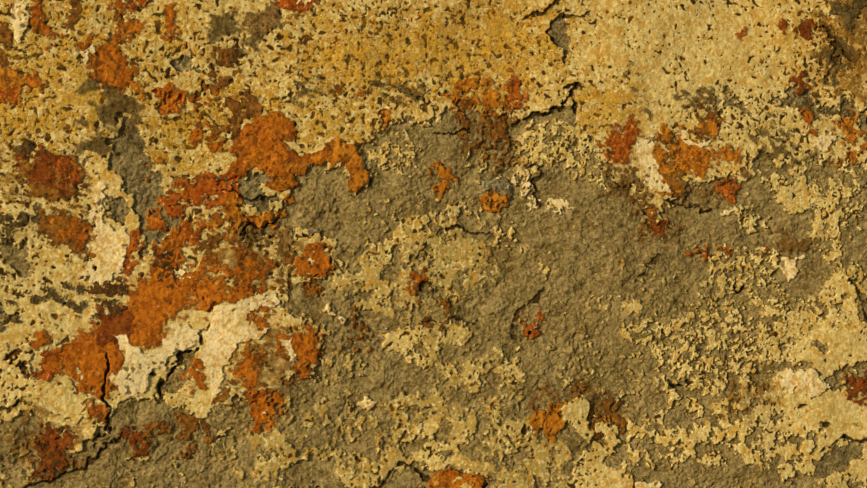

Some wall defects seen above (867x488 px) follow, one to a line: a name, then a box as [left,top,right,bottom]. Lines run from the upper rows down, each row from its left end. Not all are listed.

crack [518,0,591,24]
corrosion [372,109,392,135]
corrosion [433,62,535,179]
crack [511,82,584,127]
peeling [771,86,867,140]
corrosion [427,160,459,199]
corrosion [595,95,753,251]
corrosion [0,0,377,485]
spalling [0,100,867,488]
crack [25,355,122,488]
corrosion [528,369,630,447]
corrosion [843,367,867,406]